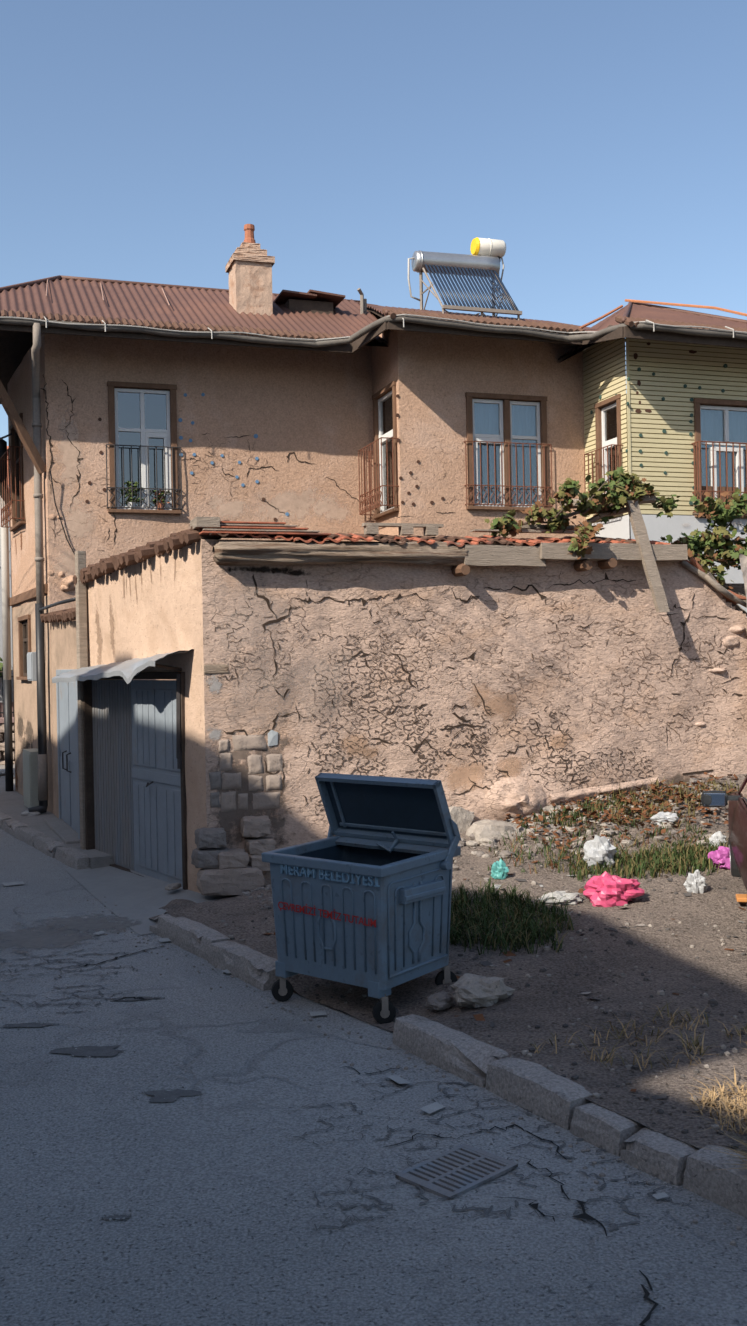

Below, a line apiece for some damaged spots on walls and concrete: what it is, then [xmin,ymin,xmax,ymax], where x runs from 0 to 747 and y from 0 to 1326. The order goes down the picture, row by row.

crack [40,376,117,556]
crack [215,572,742,816]
spalling [209,730,290,845]
crack [289,1066,693,1237]
crack [639,1270,658,1326]